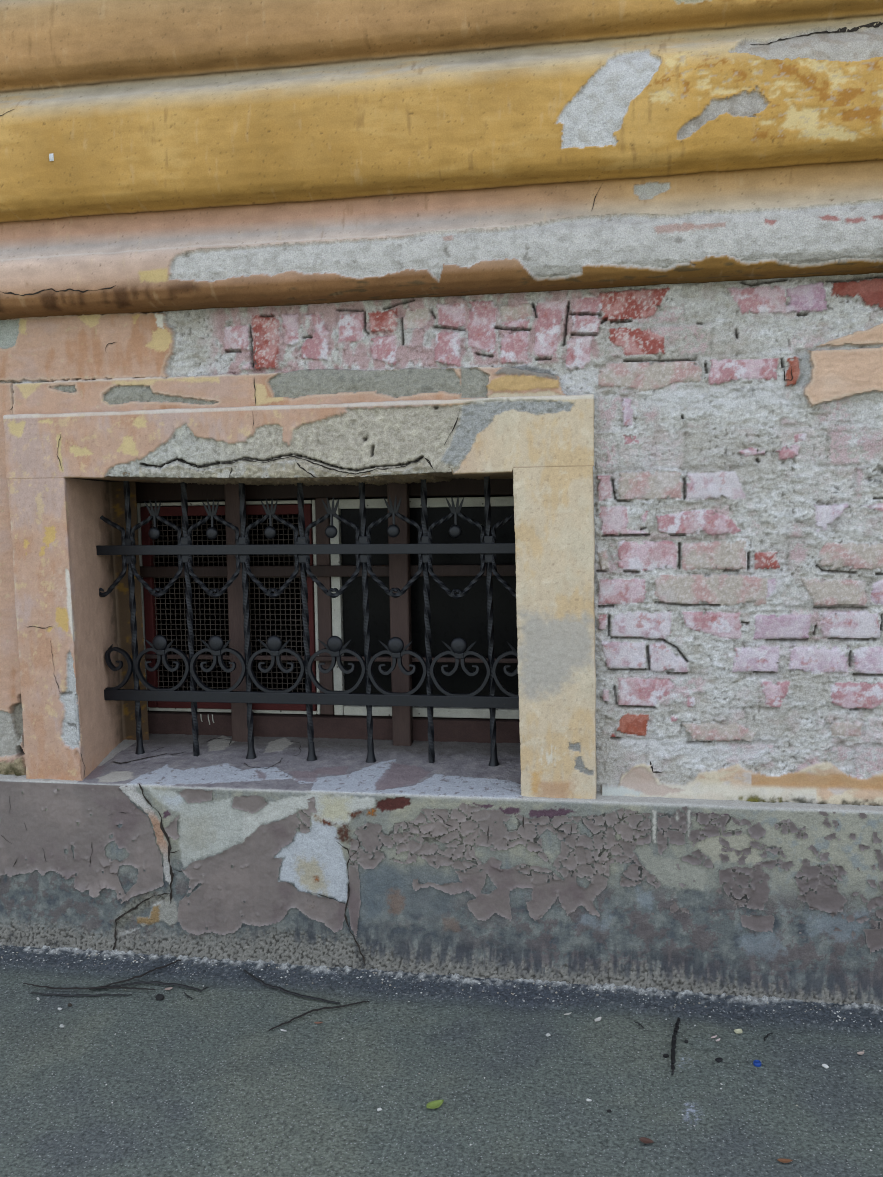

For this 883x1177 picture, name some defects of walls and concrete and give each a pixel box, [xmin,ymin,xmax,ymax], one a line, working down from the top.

peeling [557,21,883,148]
crack [142,411,460,478]
spalling [0,181,883,963]
crack [113,738,301,950]
crack [318,840,366,967]